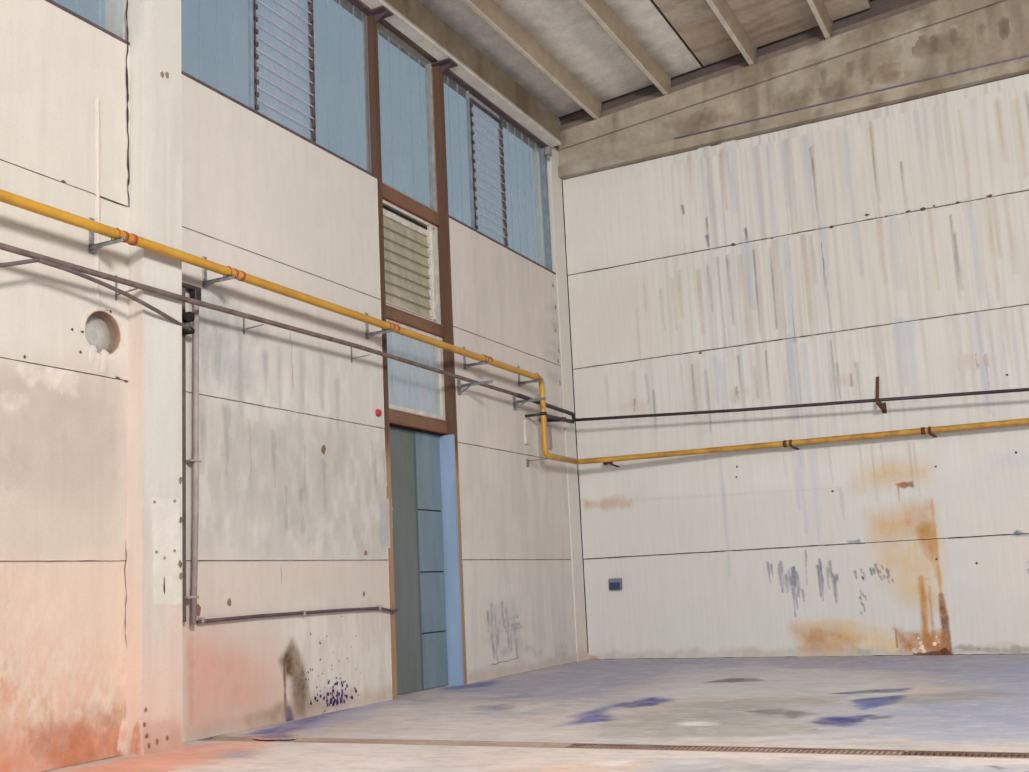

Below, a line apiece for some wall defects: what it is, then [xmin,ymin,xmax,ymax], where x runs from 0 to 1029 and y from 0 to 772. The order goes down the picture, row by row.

corrosion [785,452,957,657]
leakage [52,635,416,772]